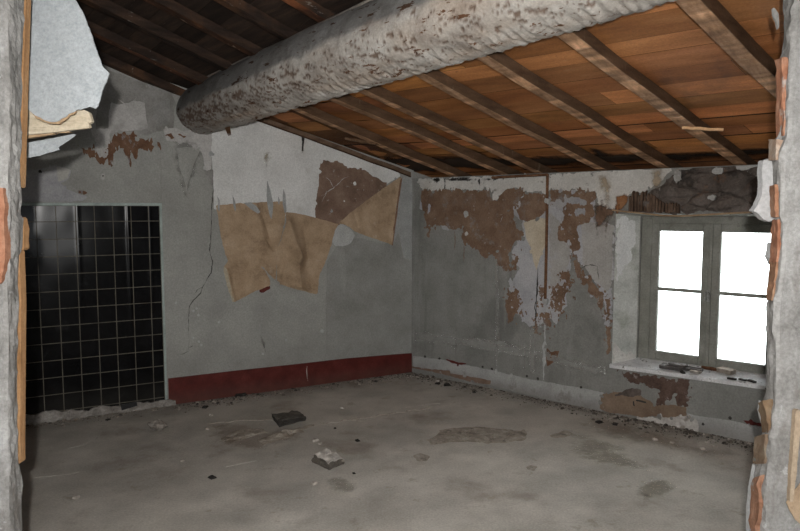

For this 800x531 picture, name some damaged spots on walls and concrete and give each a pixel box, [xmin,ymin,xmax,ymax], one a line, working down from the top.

flaking render [82,69,186,180]
crack [180,189,214,355]
flaking render [203,121,775,445]
peeling [746,464,756,531]